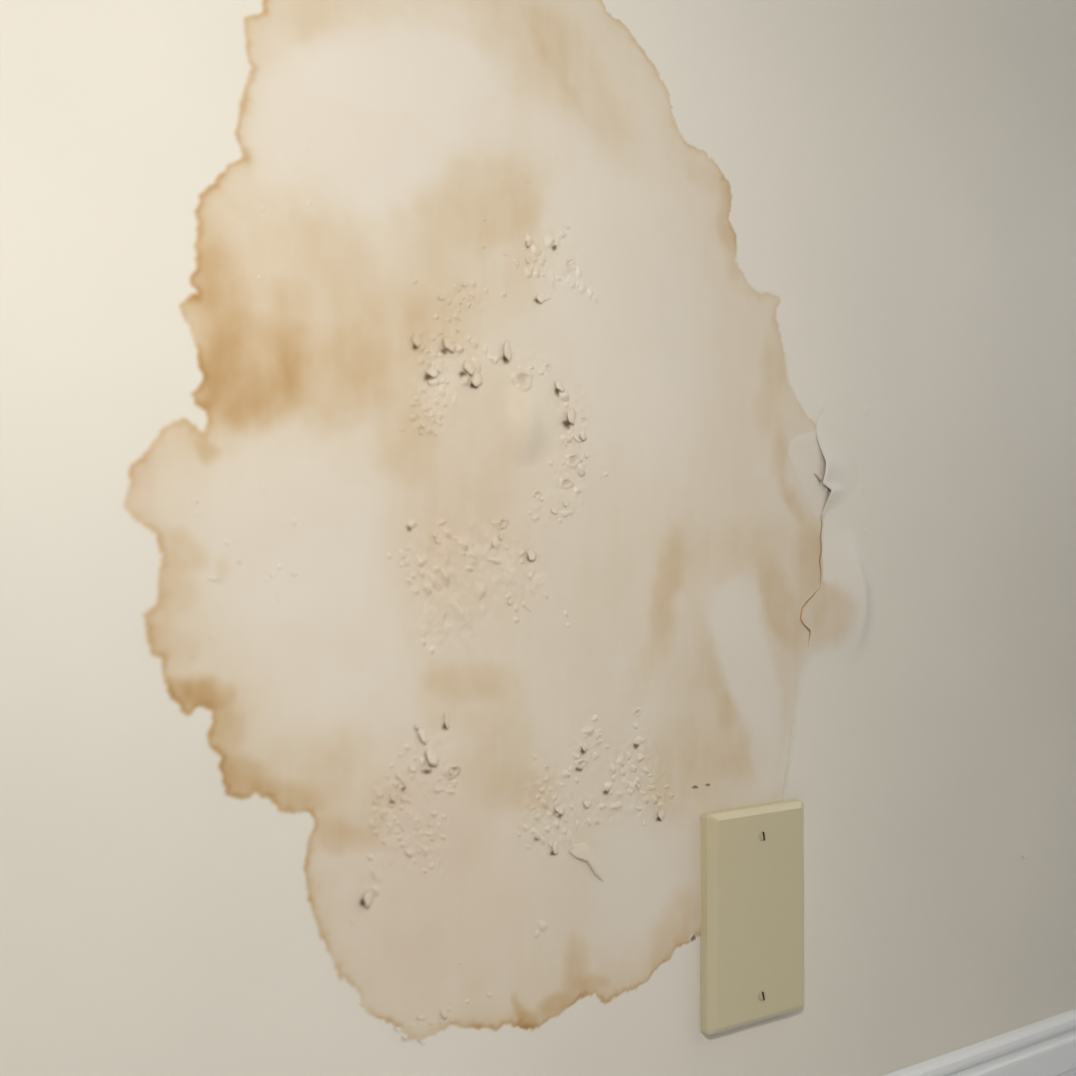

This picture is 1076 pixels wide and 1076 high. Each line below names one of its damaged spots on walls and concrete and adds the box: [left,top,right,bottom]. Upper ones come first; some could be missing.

leakage [120,0,849,1050]